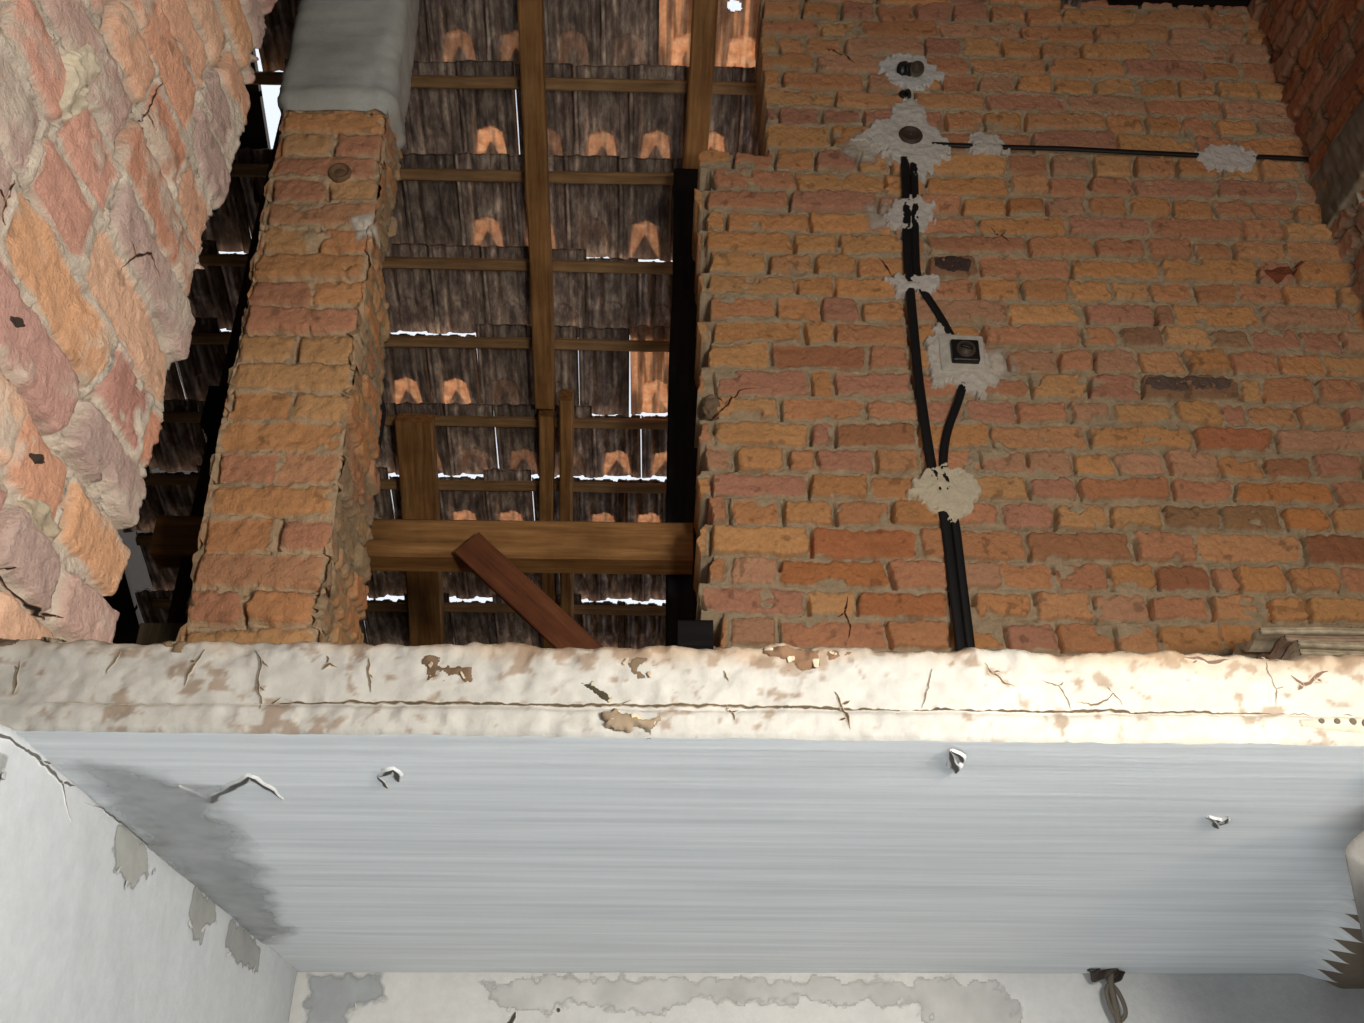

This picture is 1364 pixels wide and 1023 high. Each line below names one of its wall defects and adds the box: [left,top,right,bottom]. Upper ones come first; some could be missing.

spalling [421,655,473,683]
spalling [762,646,852,671]
spalling [581,680,661,739]
peeling [114,825,156,890]
peeling [188,886,261,973]
peeling [303,973,386,1023]
peeling [485,973,1022,1023]